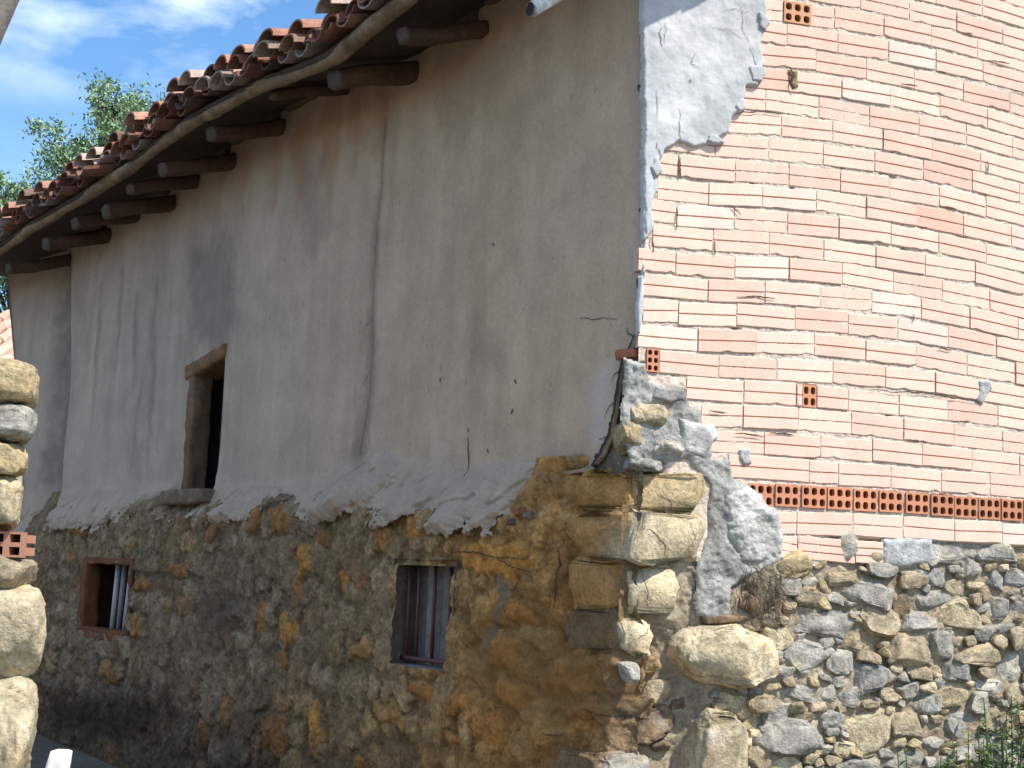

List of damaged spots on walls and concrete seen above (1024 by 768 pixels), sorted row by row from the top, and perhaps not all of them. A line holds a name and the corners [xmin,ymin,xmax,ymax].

spalling [787,67,798,89]
flaking render [591,0,770,474]
crack [641,495,696,556]
crack [454,551,533,583]